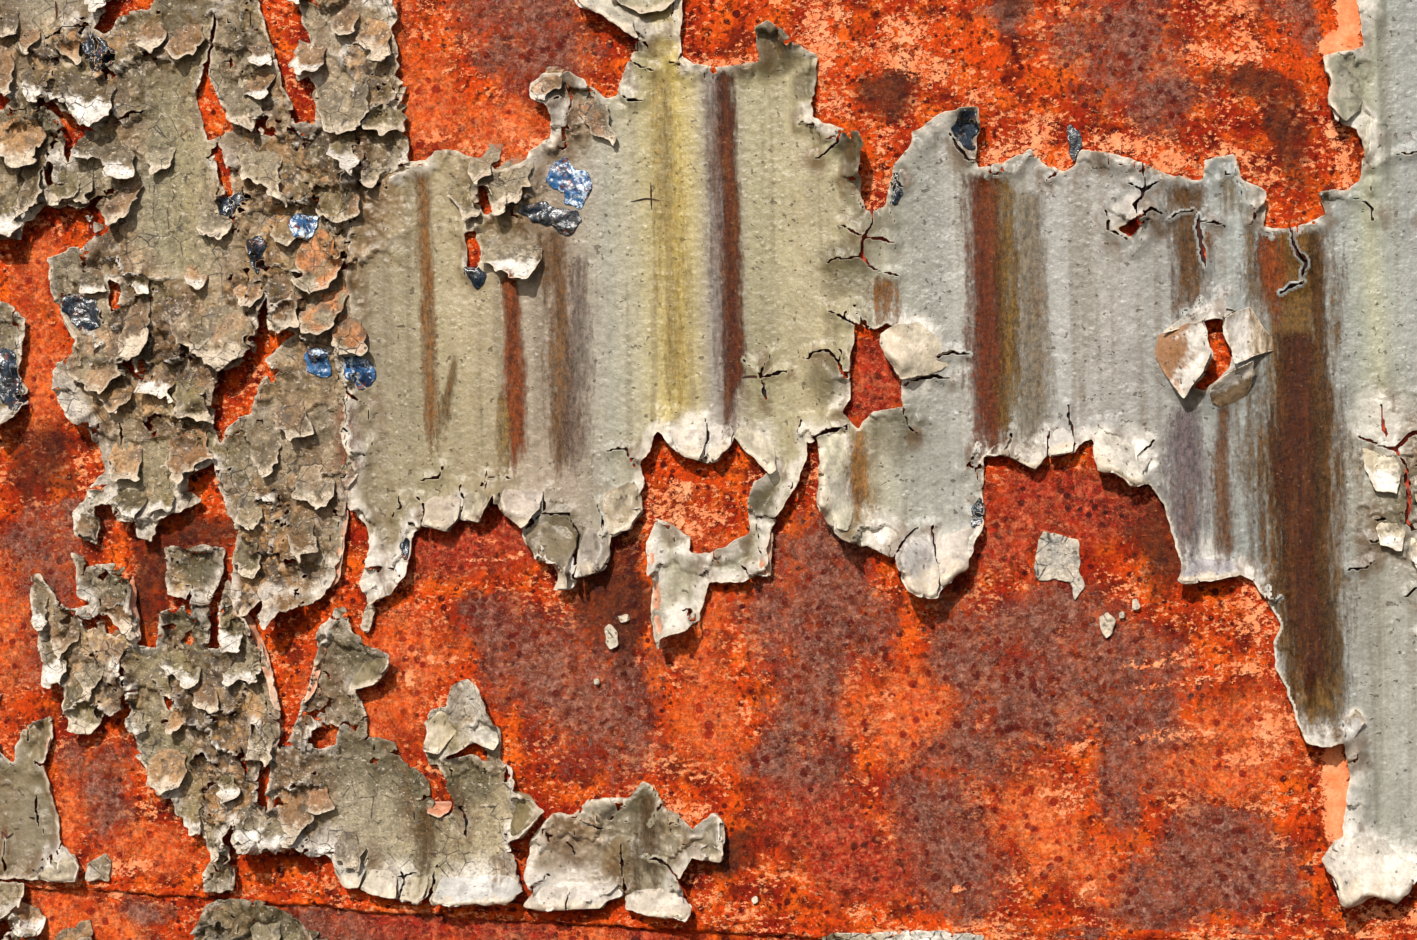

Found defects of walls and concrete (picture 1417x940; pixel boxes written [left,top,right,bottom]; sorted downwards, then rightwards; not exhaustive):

peeling [0,0,544,940]
rust [496,270,527,471]
rust [461,531,657,781]
rust [707,72,744,425]
crack [828,208,897,275]
peeling [339,0,1417,922]
rust [963,173,1051,459]
rust [668,229,1360,940]
crack [1105,163,1226,267]
crack [1281,228,1307,293]
crack [1348,409,1417,570]
peeling [822,930,984,940]